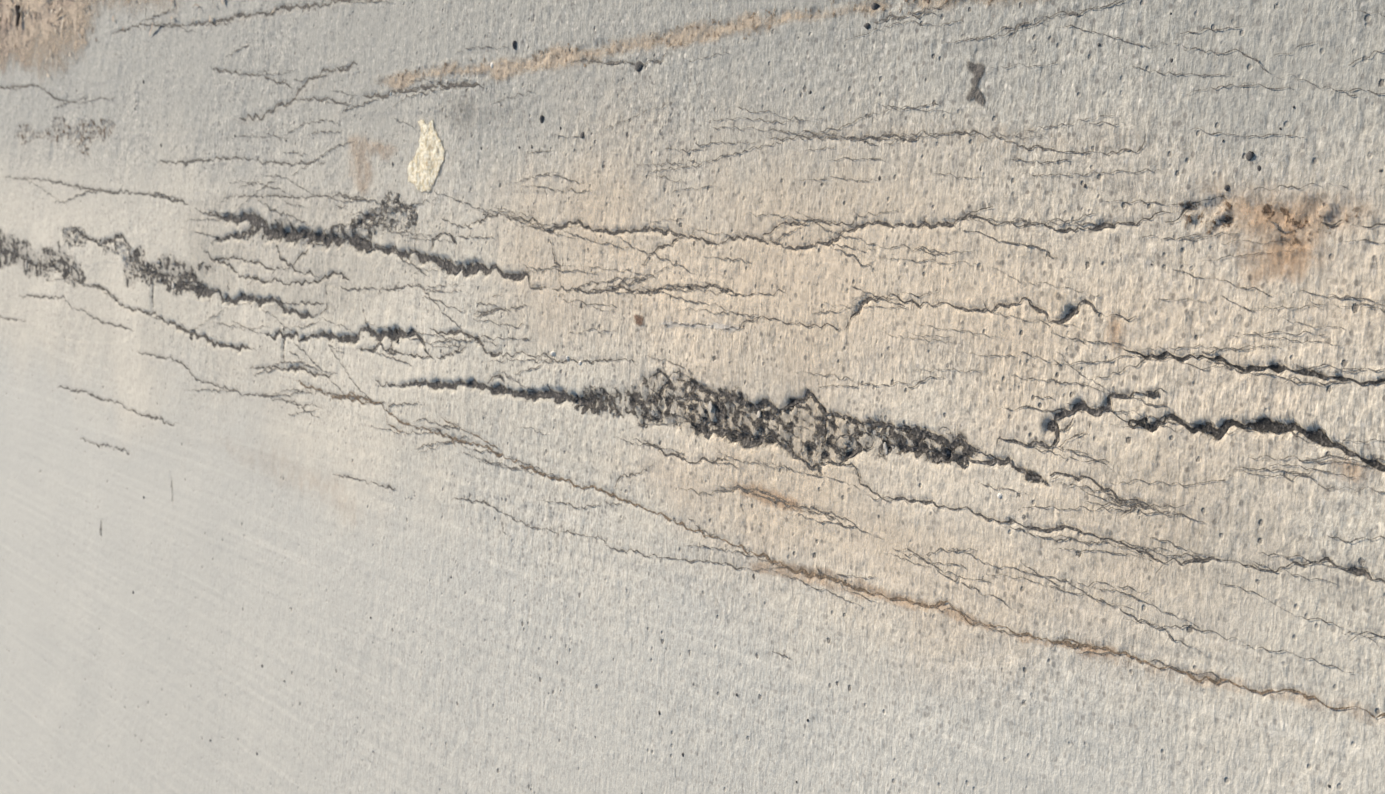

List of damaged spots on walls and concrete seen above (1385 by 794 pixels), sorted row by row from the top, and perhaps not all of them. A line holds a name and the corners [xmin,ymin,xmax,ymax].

crack [0,84,116,108]
crack [113,0,390,34]
crack [210,61,484,140]
crack [507,103,667,193]
crack [572,52,729,66]
crack [640,102,1159,195]
crack [845,0,1385,97]
crack [1190,128,1304,138]
rust [1241,206,1304,261]
crack [4,141,1385,718]
spalling [570,370,1048,485]